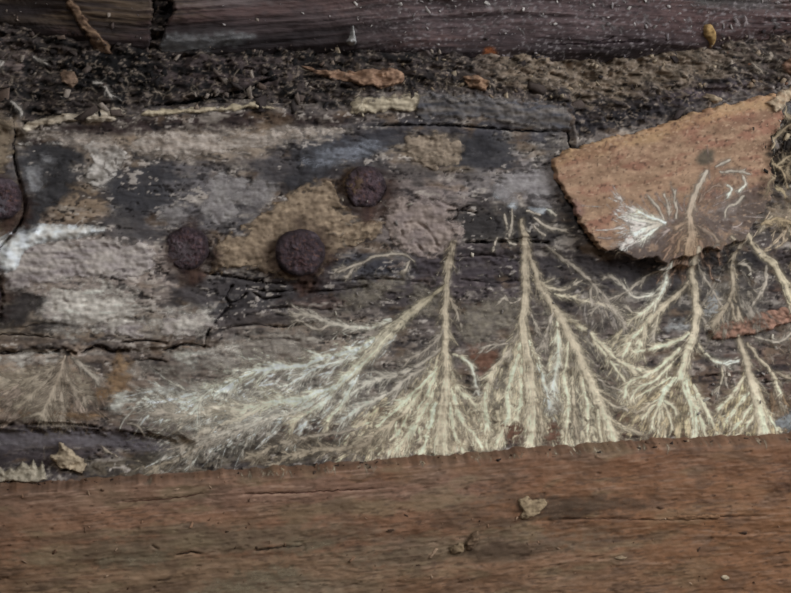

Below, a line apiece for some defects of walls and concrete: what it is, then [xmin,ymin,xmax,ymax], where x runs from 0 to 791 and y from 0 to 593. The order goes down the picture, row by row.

rust [0,276,11,305]
water stain [0,280,138,333]
water stain [174,310,211,333]
crack [0,273,420,362]
water stain [176,331,320,371]
water stain [469,349,497,371]
water stain [503,424,523,439]
water stain [544,422,561,444]